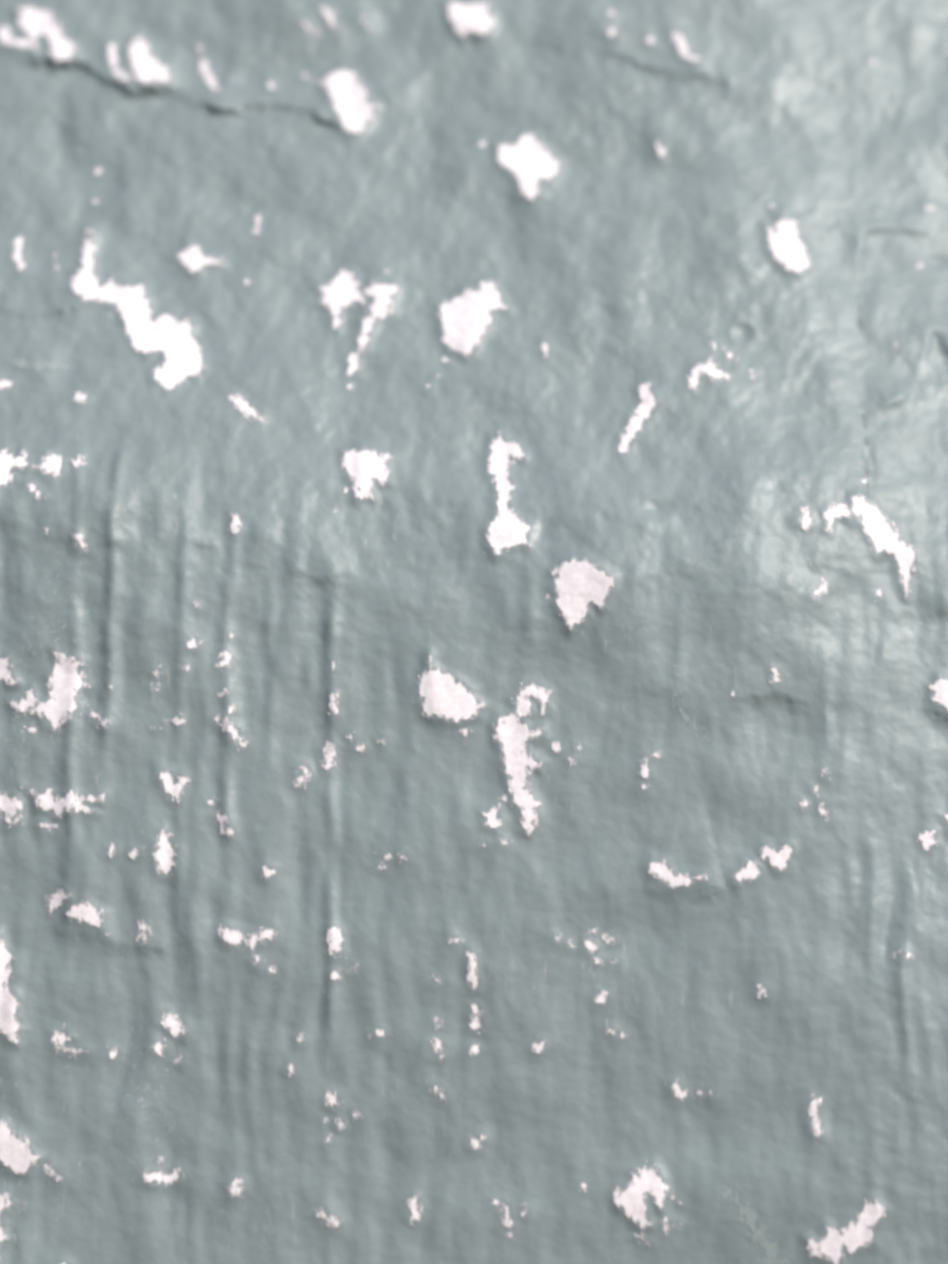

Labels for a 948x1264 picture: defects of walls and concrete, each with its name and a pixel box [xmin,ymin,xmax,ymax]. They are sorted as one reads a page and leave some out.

peeling [303,70,378,134]
peeling [480,134,559,201]
peeling [71,229,203,390]
peeling [426,281,507,388]
peeling [801,479,916,597]
peeling [547,559,614,630]
peeling [0,652,107,733]
peeling [418,655,485,736]
peeling [483,682,581,845]
peeling [0,789,105,830]
peeling [613,1160,681,1244]
peeling [806,1200,886,1264]